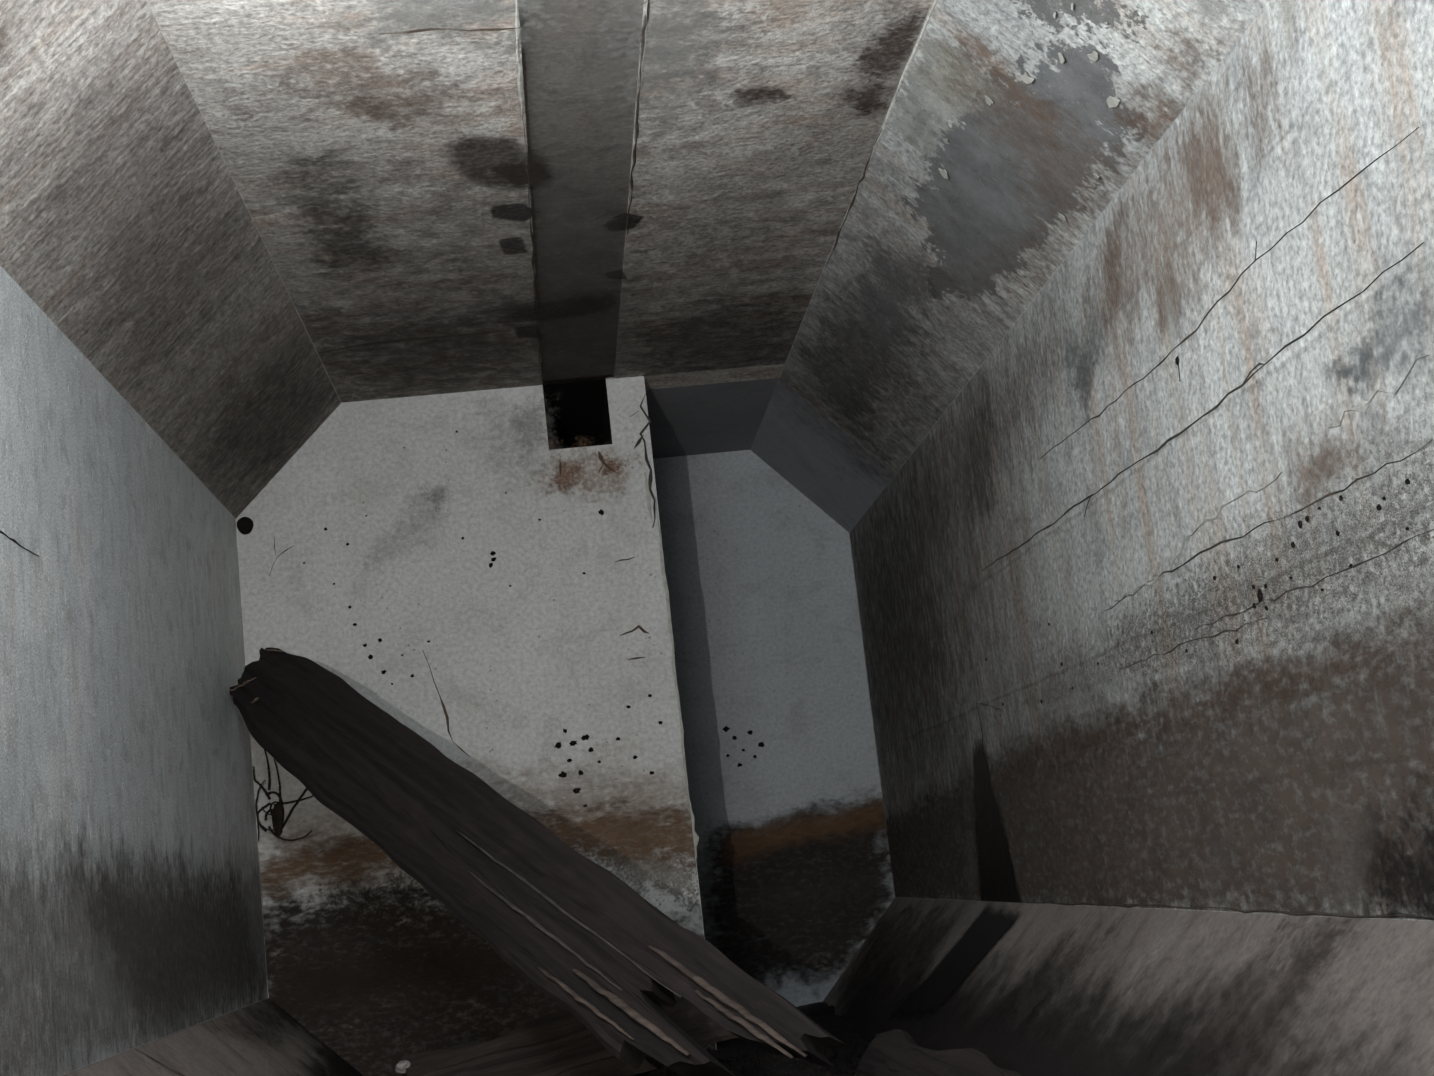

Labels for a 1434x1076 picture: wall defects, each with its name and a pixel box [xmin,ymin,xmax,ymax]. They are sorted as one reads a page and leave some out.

damp [449,137,548,254]
damp [735,88,791,103]
damp [847,12,927,116]
crack [982,242,1424,571]
crack [1040,127,1419,459]
damp [0,837,568,1076]
damp [533,622,1434,1076]